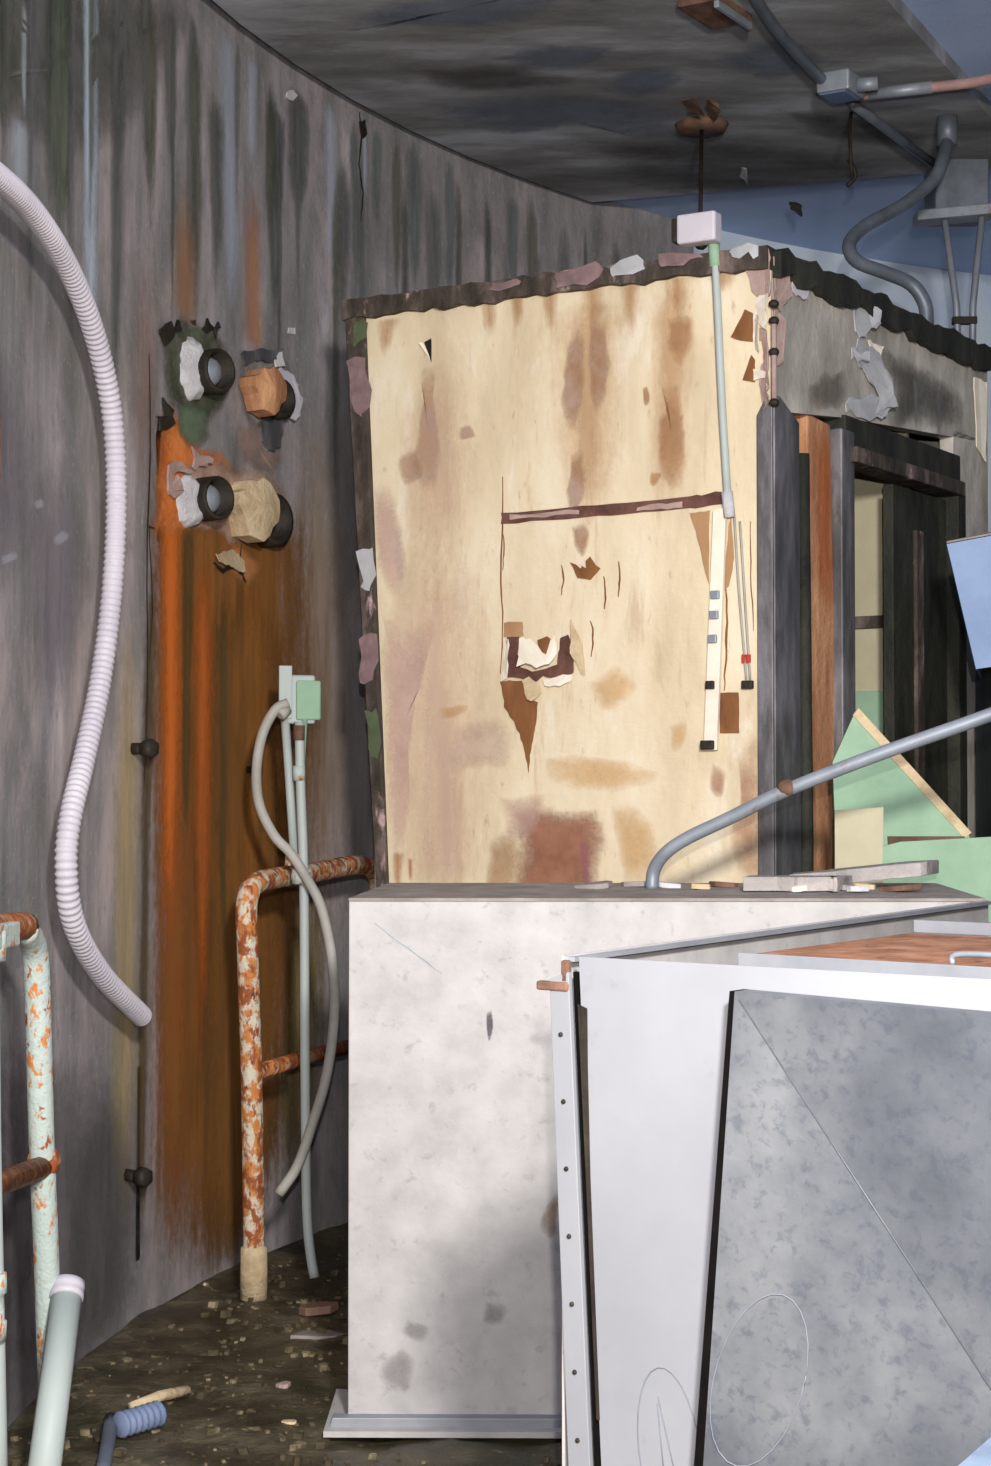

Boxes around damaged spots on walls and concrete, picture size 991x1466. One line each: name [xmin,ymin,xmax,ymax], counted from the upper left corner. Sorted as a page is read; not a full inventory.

leakage [0,0,308,346]
spalling [155,318,303,498]
peeling [489,279,521,291]
peeling [555,253,704,288]
leakage [644,279,690,483]
peeling [845,306,898,421]
peeling [973,377,987,462]
corrosion [140,417,314,1257]
leakage [491,805,602,883]
leakage [1,1085,29,1169]
leakage [53,1010,131,1351]
leakage [2,1185,37,1412]